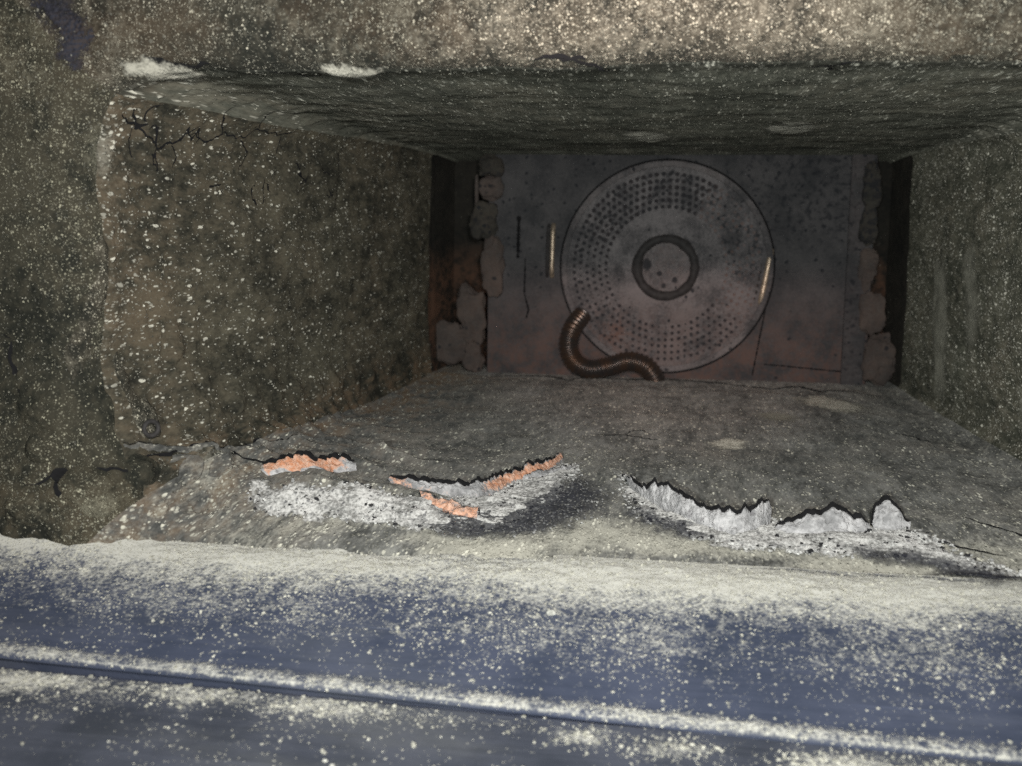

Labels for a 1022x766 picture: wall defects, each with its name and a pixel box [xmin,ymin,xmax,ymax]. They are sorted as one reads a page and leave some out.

crack [122,105,339,205]
peeling [248,450,600,537]
peeling [617,474,1018,582]